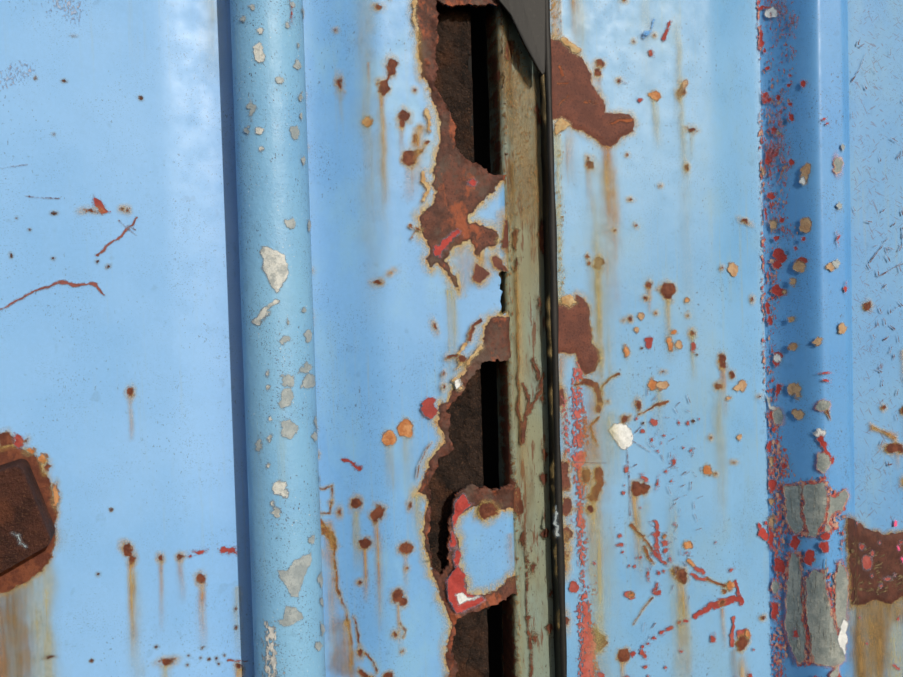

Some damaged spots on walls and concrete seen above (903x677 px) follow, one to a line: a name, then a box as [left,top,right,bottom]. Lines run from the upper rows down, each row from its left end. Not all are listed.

rust [362,58,398,143]
rust [400,108,432,201]
rust [550,0,636,445]
peeling [251,246,289,326]
peeling [721,262,739,277]
peeling [279,361,316,408]
rust [472,7,553,677]
peeling [725,370,747,401]
peeling [751,0,850,677]
rust [0,430,60,594]
peeling [278,535,315,626]
rust [846,517,903,677]